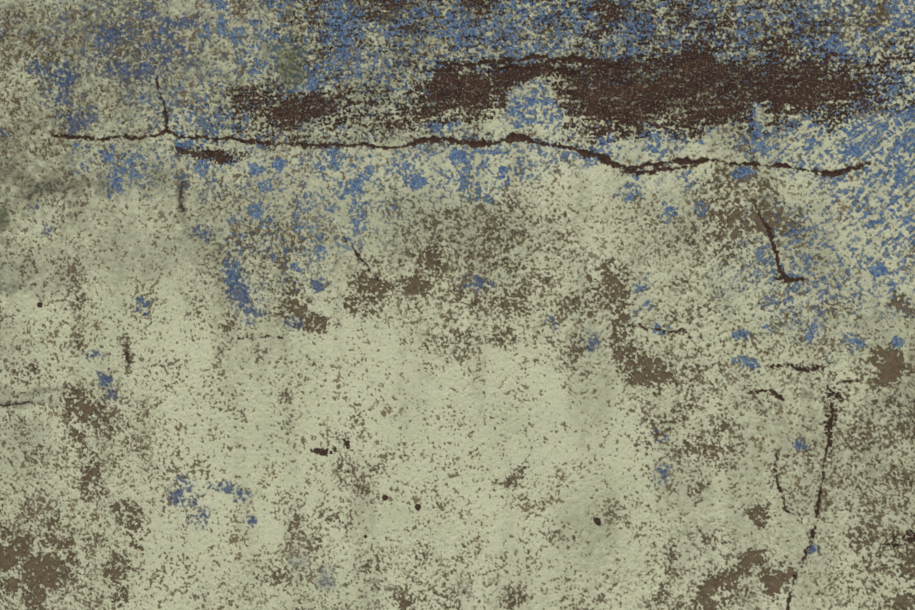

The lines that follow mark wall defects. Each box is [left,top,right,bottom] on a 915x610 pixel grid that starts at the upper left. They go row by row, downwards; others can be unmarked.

crack [436,53,623,74]
crack [51,77,871,177]
crack [178,182,186,212]
crack [753,199,808,287]
crack [746,362,862,610]